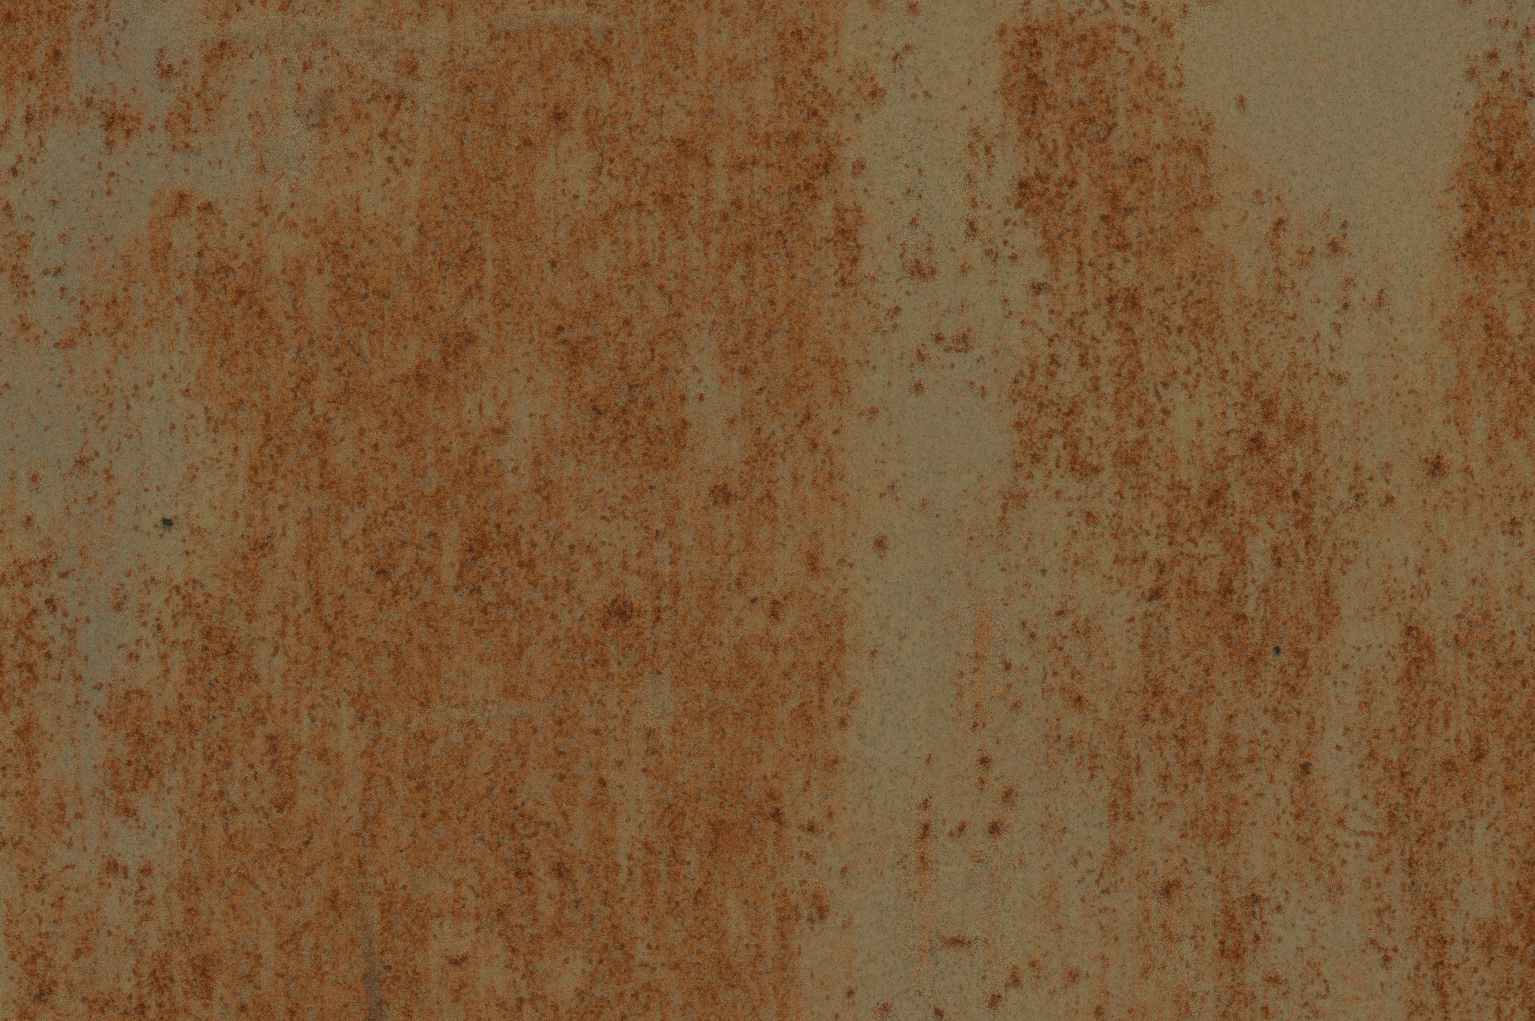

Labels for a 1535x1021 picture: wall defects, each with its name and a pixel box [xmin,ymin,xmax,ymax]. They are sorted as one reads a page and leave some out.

corrosion [0,0,991,1021]